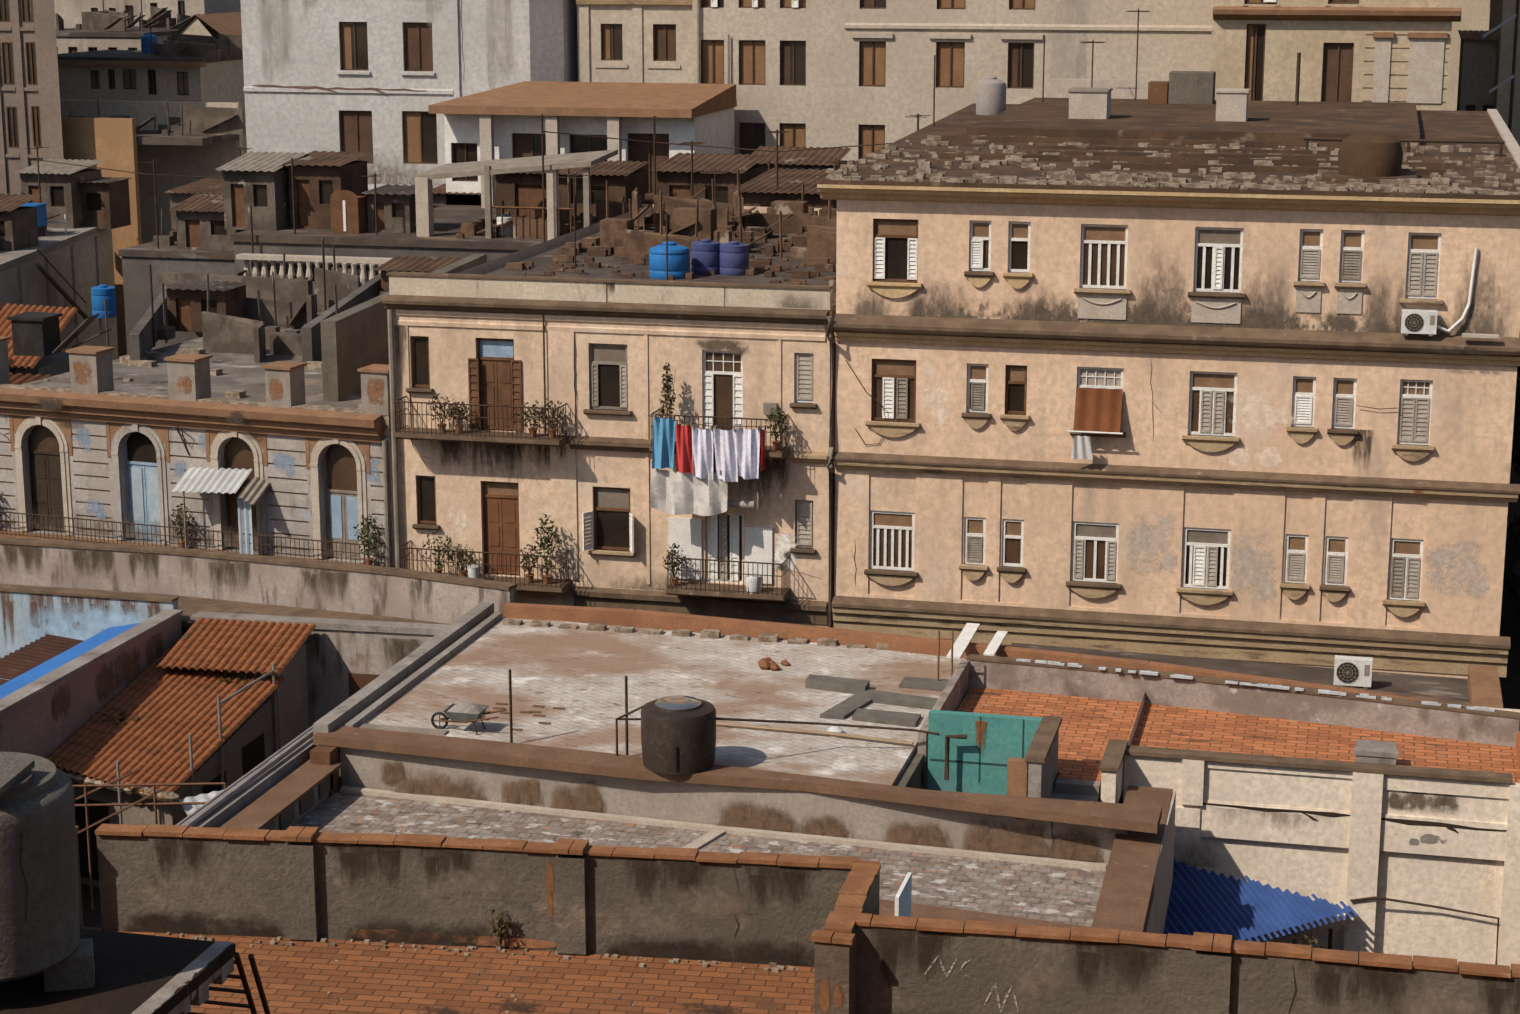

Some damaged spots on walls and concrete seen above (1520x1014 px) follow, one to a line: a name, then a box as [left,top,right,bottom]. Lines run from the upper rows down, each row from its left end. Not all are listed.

water stain [913,291,1402,333]
water stain [1436,302,1504,355]
water stain [382,761,604,812]
water stain [717,804,848,838]
crack [1203,803,1507,833]
water stain [335,843,400,879]
water stain [420,847,469,874]
water stain [632,858,707,891]
water stain [746,865,809,901]
water stain [351,925,527,950]
water stain [1077,941,1162,984]
water stain [1314,962,1412,997]